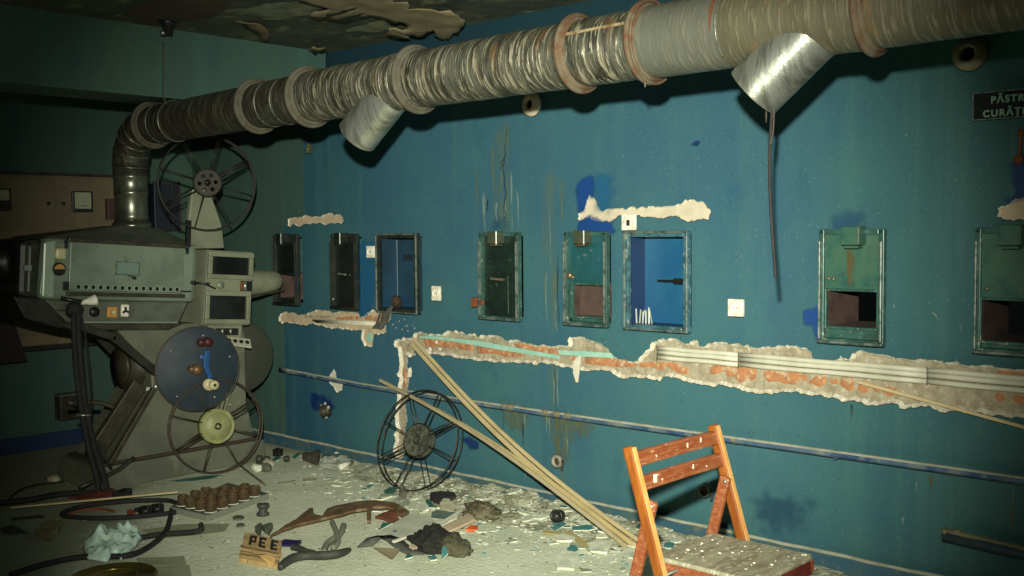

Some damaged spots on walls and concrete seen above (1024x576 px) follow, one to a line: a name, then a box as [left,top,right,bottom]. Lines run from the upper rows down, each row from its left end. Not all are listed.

peeling [296,0,465,40]
crack [487,131,507,225]
peeling [288,213,344,227]
peeling [578,196,711,222]
peeling [997,197,1024,221]
flaking render [278,306,1024,459]